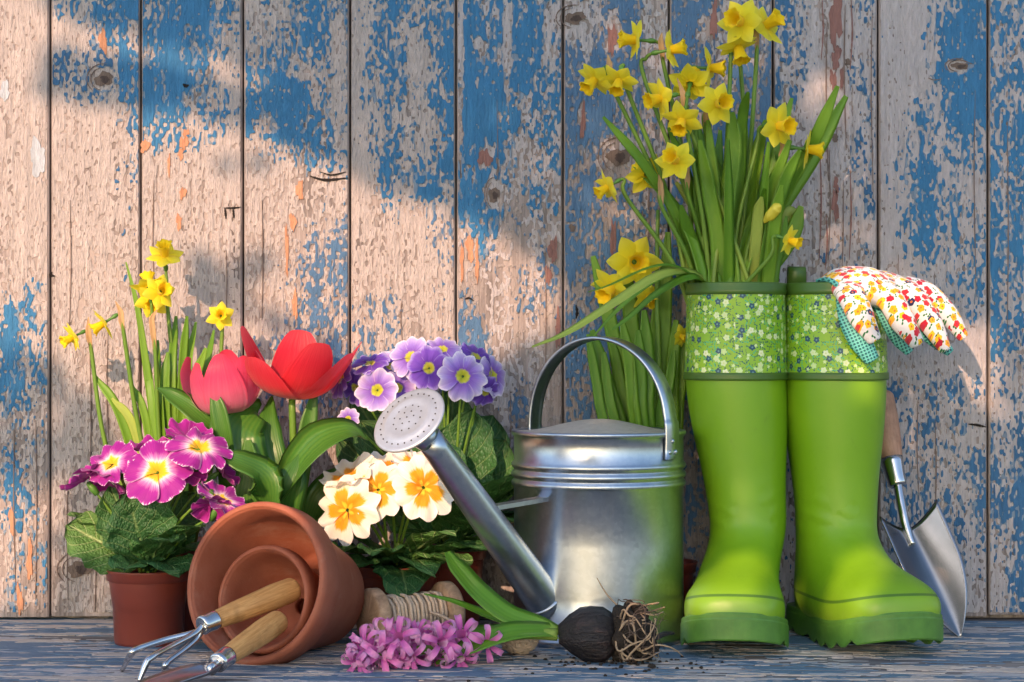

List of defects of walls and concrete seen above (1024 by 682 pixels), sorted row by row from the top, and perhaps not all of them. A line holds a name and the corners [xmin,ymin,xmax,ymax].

peeling [0,0,454,682]
peeling [458,0,1024,613]
peeling [202,621,1024,682]